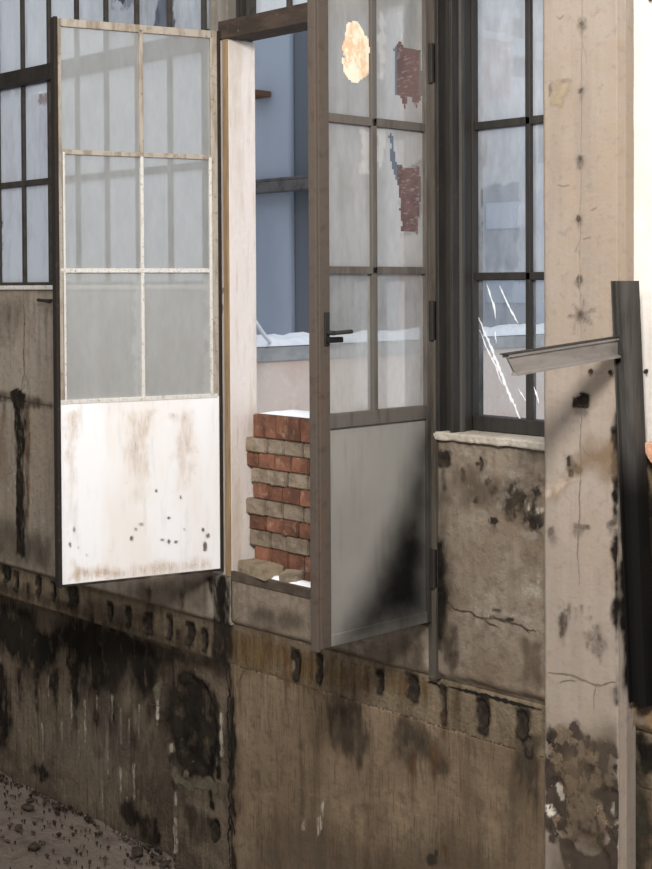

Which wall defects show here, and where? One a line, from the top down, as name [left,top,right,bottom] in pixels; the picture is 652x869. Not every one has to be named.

damp [0,388,52,564]
damp [612,428,621,518]
damp [207,575,231,667]
damp [437,541,458,660]
crack [449,603,536,634]
damp [0,583,200,846]
damp [335,703,368,765]
damp [395,718,448,774]
spalling [515,707,533,758]
crack [548,672,613,710]
flaking render [633,705,652,729]
flaking render [545,721,619,869]